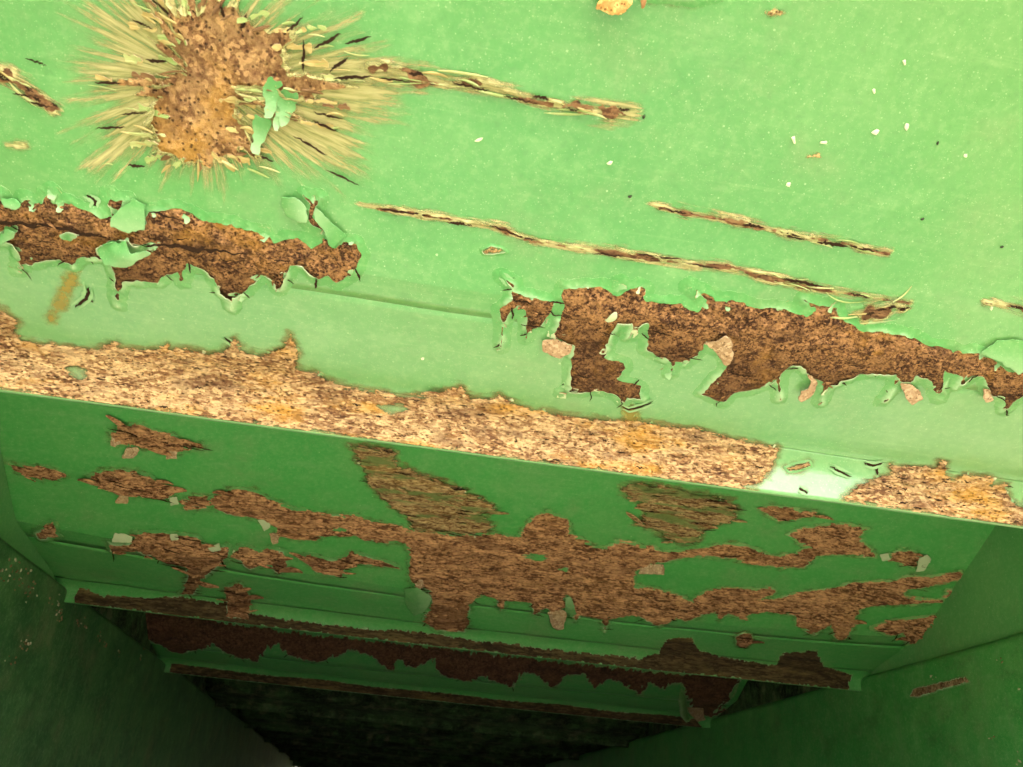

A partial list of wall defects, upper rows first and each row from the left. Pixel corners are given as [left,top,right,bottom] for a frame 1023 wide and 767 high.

peeling [128,0,206,46]
peeling [237,10,270,23]
peeling [272,24,343,82]
crack [284,16,642,126]
peeling [596,0,722,15]
peeling [130,131,166,164]
peeling [195,76,350,172]
crack [293,111,912,324]
crack [981,298,1023,312]
peeling [347,443,509,537]
corrosion [0,243,1023,728]
peeling [620,481,747,544]